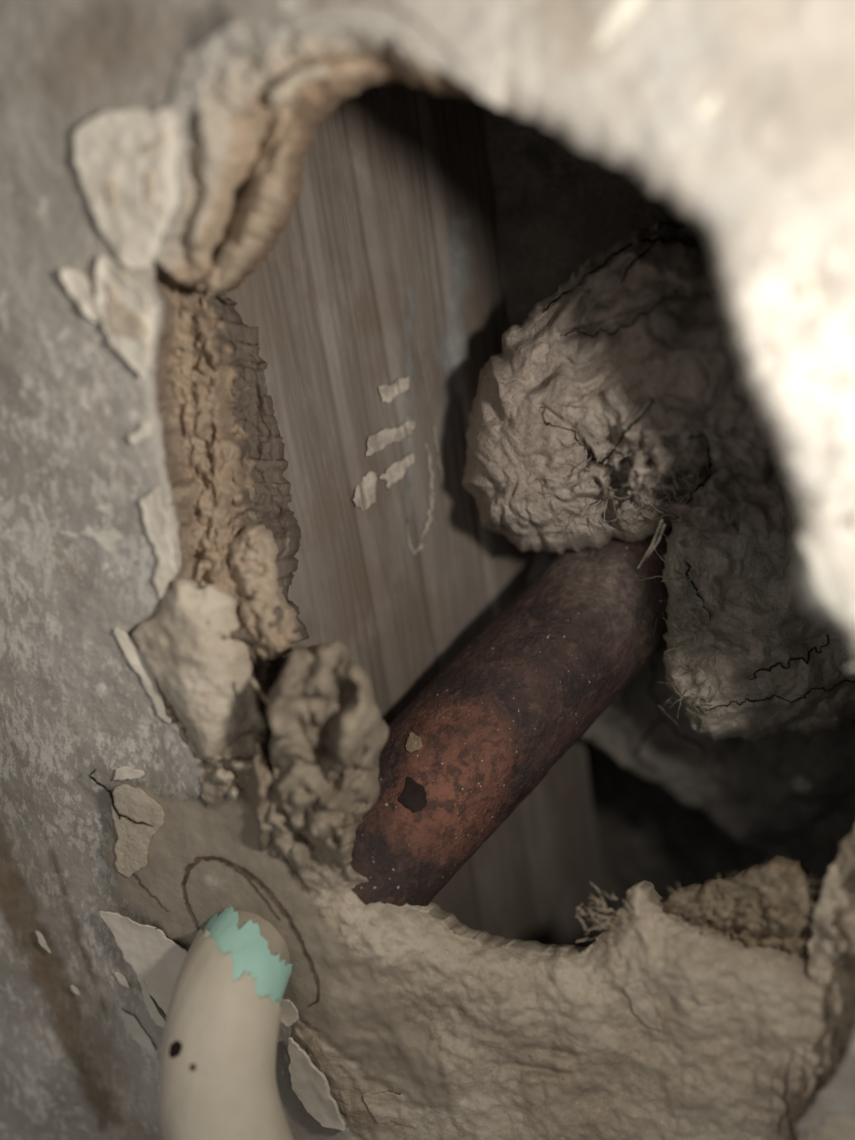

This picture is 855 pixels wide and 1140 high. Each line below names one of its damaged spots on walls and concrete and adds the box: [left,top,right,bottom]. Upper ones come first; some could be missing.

peeling [590,0,644,53]
spalling [53,17,511,761]
crack [88,769,154,843]
spalling [111,766,164,877]
peeling [36,930,51,953]
peeling [99,911,188,1058]
spalling [199,732,855,1140]